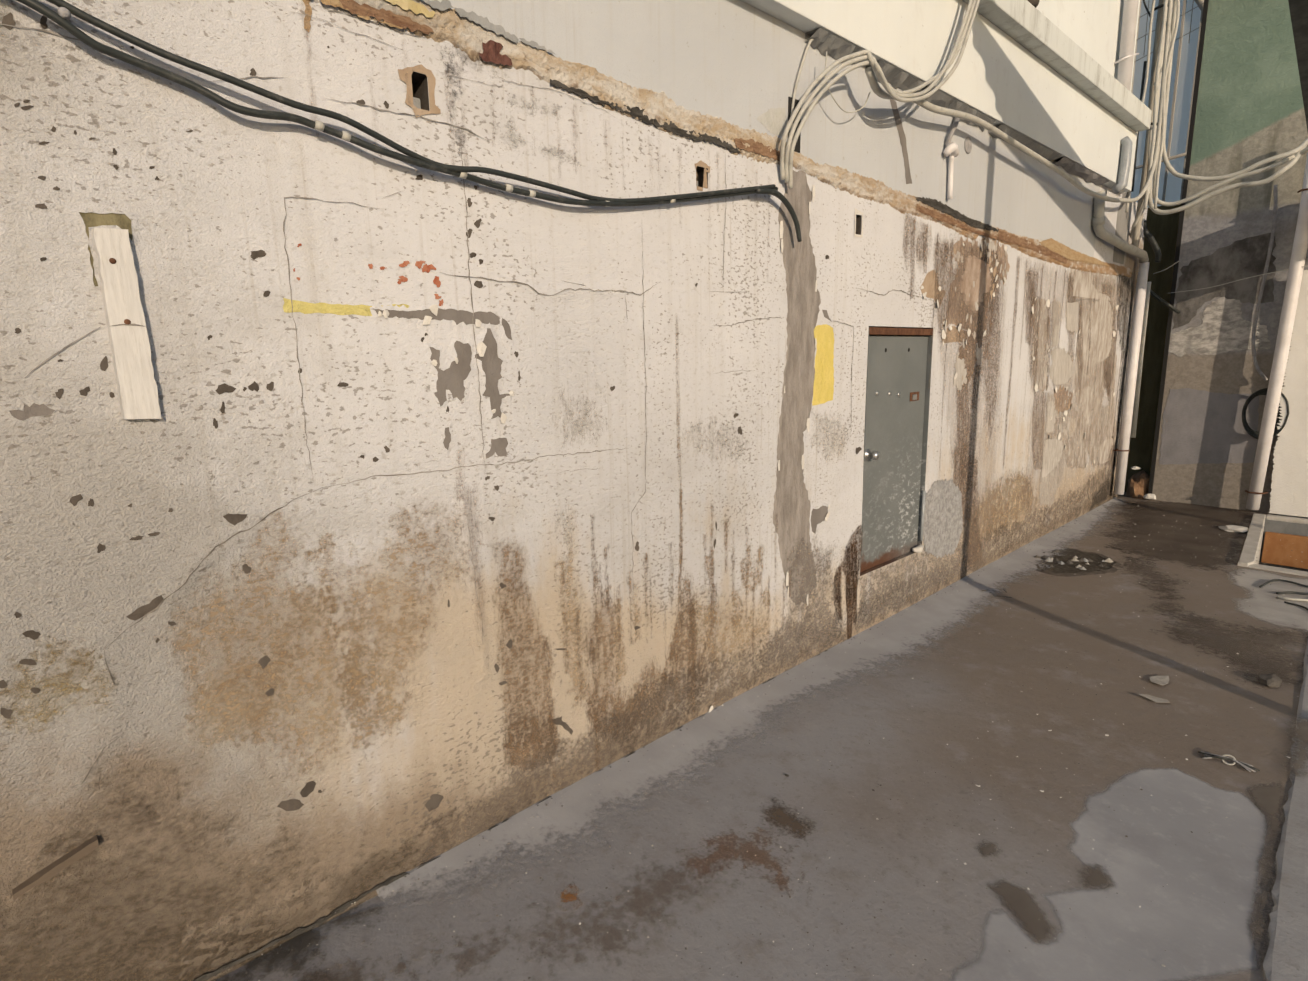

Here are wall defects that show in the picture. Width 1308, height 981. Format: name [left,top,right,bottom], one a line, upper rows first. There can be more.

peeling [66,202,143,291]
peeling [251,250,266,259]
spalling [320,0,1132,506]
peeling [213,381,274,429]
crack [104,98,658,685]
peeling [70,494,94,507]
peeling [223,513,247,525]
water stain [422,275,1133,864]
water stain [176,506,458,771]
water stain [211,907,382,981]